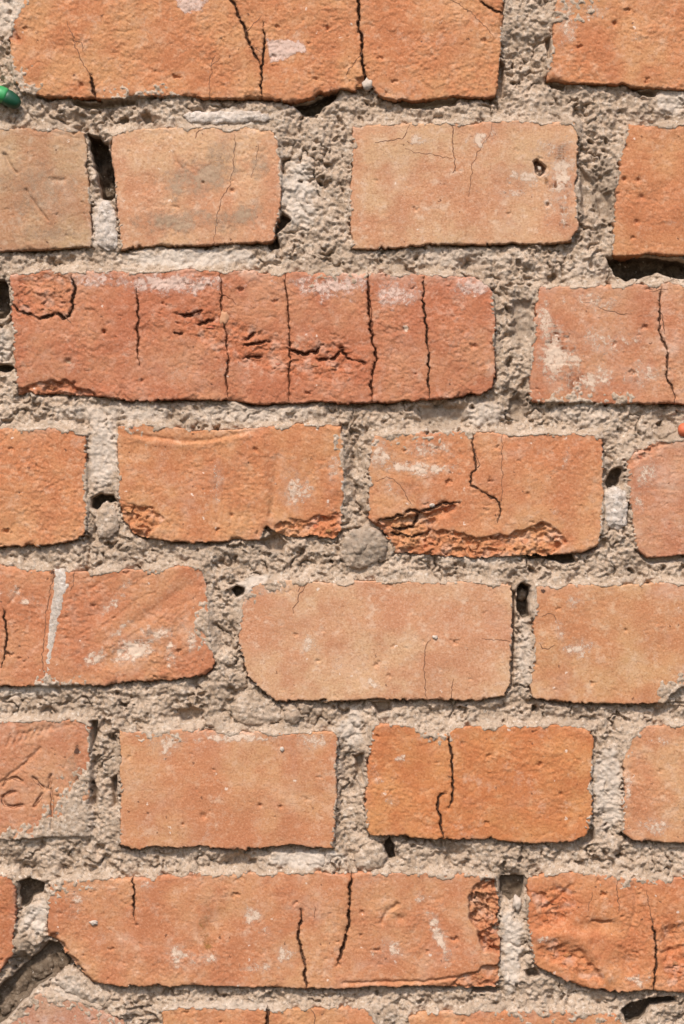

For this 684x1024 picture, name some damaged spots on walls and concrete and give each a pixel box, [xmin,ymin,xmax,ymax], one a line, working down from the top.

crack [230,0,266,100]
spalling [17,274,73,316]
crack [367,272,378,400]
crack [422,276,430,400]
spalling [119,501,164,538]
spalling [275,513,343,539]
crack [375,432,503,539]
spalling [376,505,567,559]
crack [437,736,454,837]
crack [297,907,316,1024]
crack [338,871,352,960]
spalling [451,879,500,988]